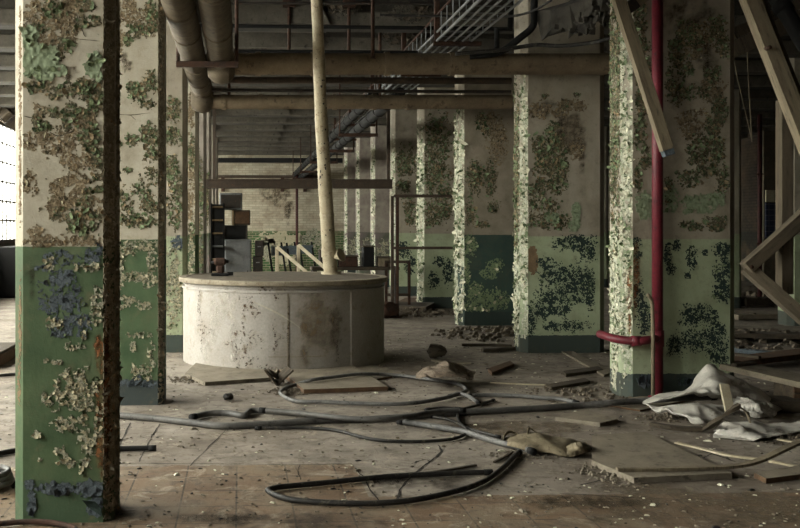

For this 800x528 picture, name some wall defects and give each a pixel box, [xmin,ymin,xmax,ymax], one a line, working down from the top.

corrosion [93,310,112,485]
peeling [18,0,210,520]
spalling [343,0,652,391]
peeling [677,377,694,386]
peeling [663,14,731,367]